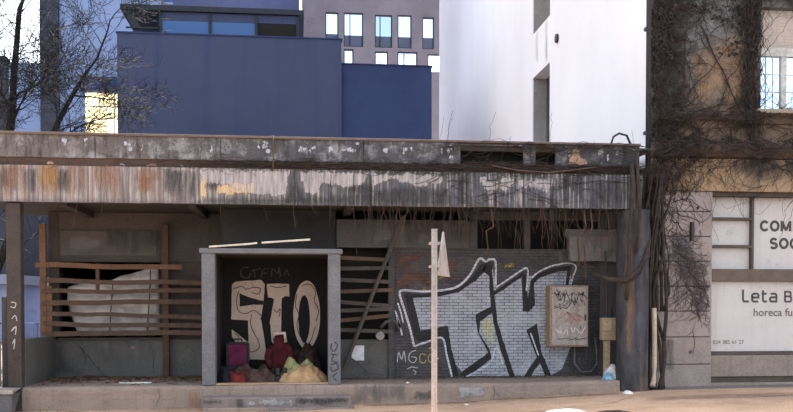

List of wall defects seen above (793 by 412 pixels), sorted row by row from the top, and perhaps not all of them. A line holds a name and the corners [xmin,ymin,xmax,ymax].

spalling [567,149,587,166]
peeling [395,252,438,289]